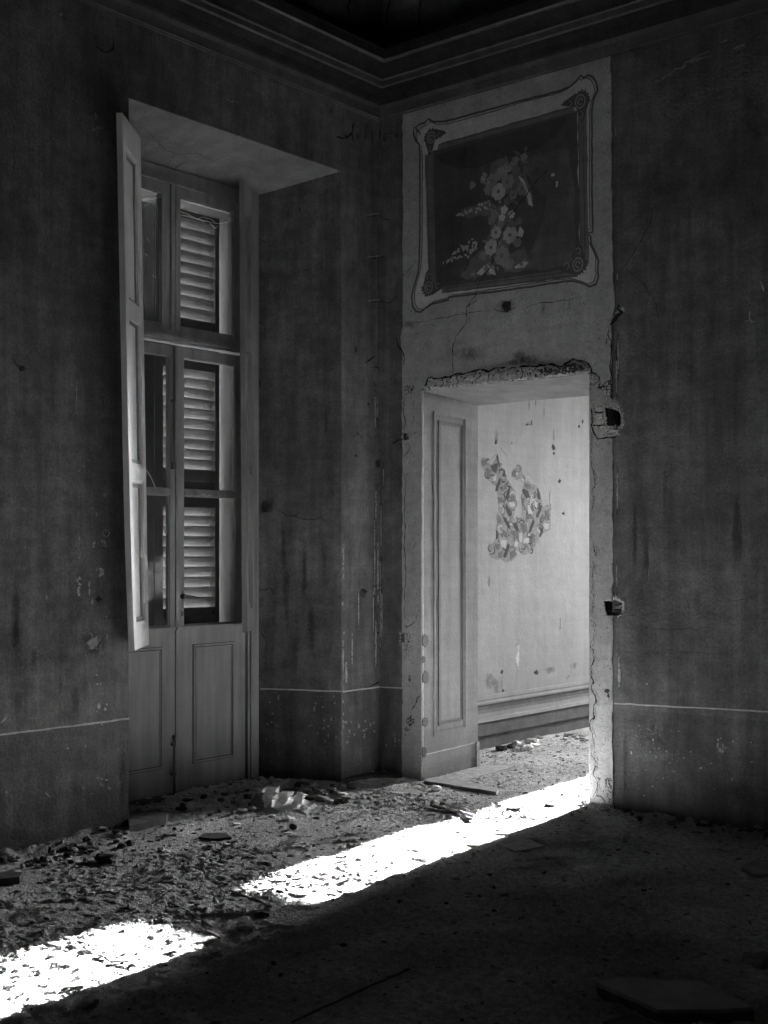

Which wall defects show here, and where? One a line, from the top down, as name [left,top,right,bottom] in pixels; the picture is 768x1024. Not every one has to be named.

crack [365,170,547,387]
spalling [404,358,625,437]
crack [566,304,625,803]